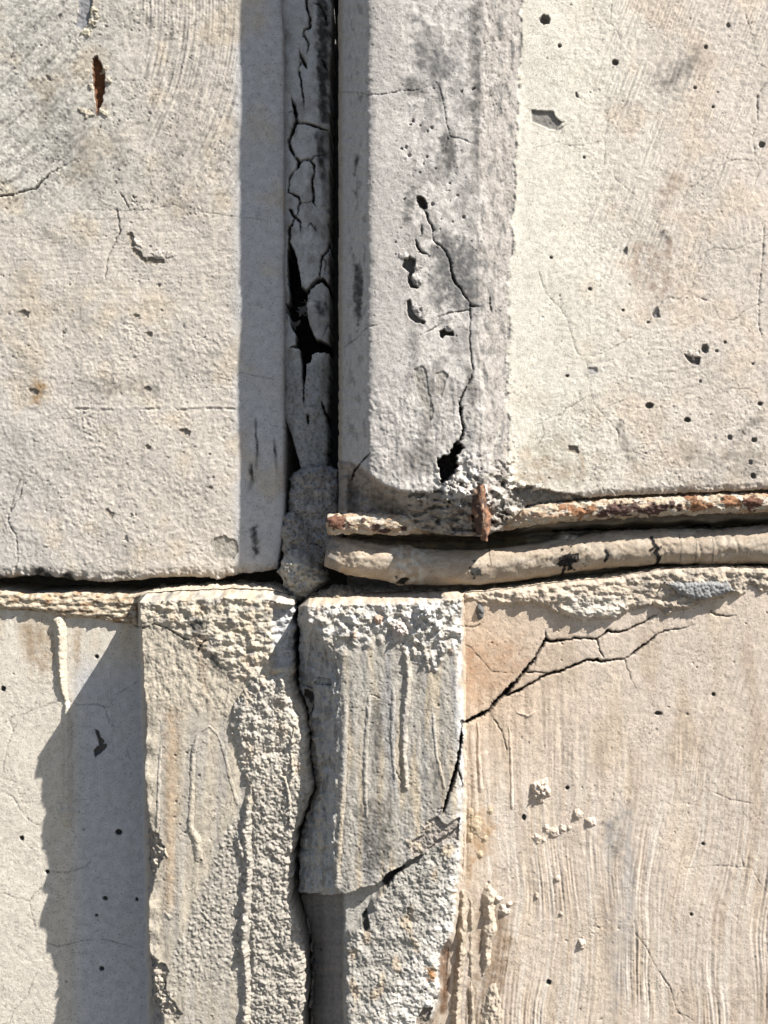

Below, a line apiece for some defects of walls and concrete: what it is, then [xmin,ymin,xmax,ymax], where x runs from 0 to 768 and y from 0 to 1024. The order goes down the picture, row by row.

crack [288,0,333,277]
peeling [531,110,567,130]
crack [416,212,491,442]
rust [326,514,407,533]
rust [558,494,764,521]
crack [440,617,678,813]